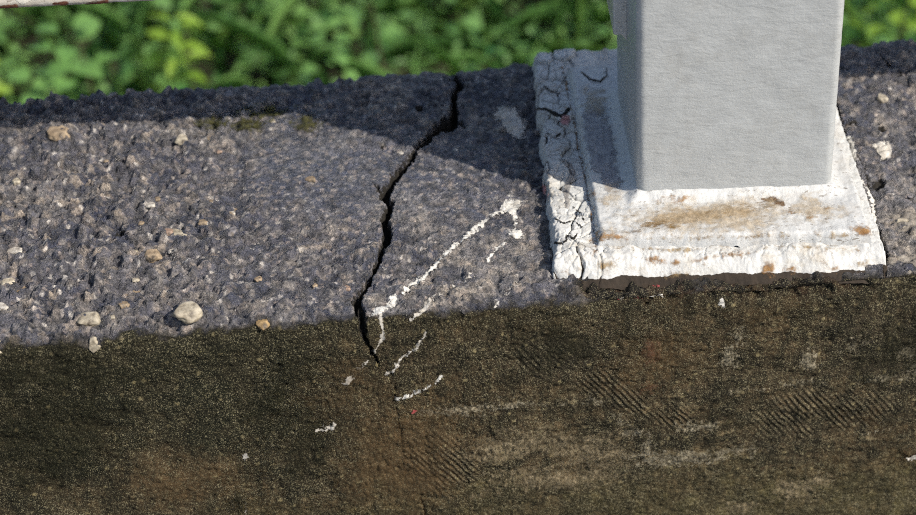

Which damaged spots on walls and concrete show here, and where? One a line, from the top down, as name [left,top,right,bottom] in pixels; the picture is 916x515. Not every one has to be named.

crack [537,67,607,244]
rust [633,196,832,238]
rust [831,226,871,238]
crack [348,76,465,457]
efflorescence [429,401,531,419]